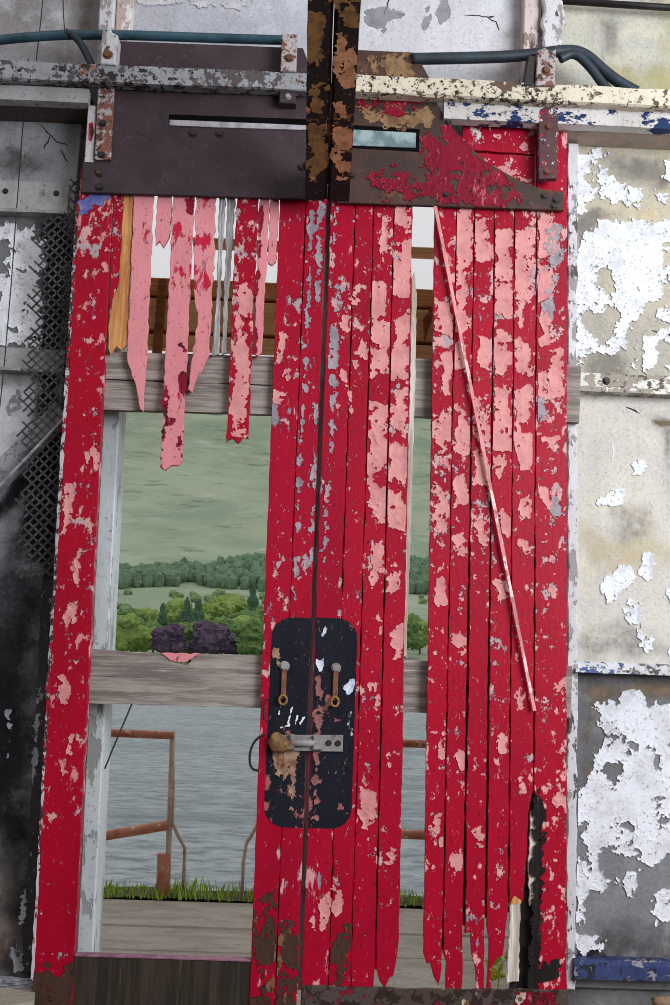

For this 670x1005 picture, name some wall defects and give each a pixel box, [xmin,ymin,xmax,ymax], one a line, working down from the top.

peeling [0,221,47,349]
peeling [295,201,328,534]
peeling [334,206,412,532]
peeling [431,208,565,558]
peeling [576,147,670,374]
peeling [10,201,79,982]
peeling [368,540,400,593]
peeling [600,551,657,653]
peeling [309,881,344,932]
peeling [357,786,378,830]
peeling [428,813,463,872]
peeling [575,689,670,956]